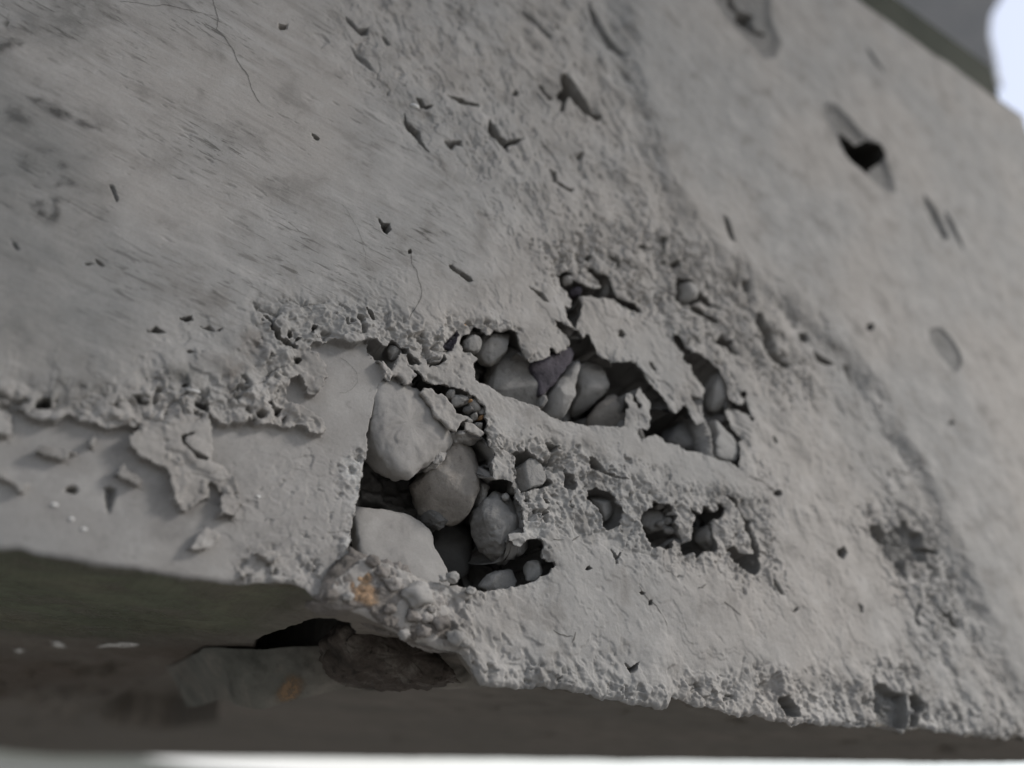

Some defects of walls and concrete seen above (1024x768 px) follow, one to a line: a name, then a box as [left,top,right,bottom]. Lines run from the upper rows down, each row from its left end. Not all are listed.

crack [123,1,259,101]
hole [449,264,474,282]
hole [741,279,751,293]
peeling [476,446,517,487]
spalling [589,456,629,479]
spalling [0,307,484,692]